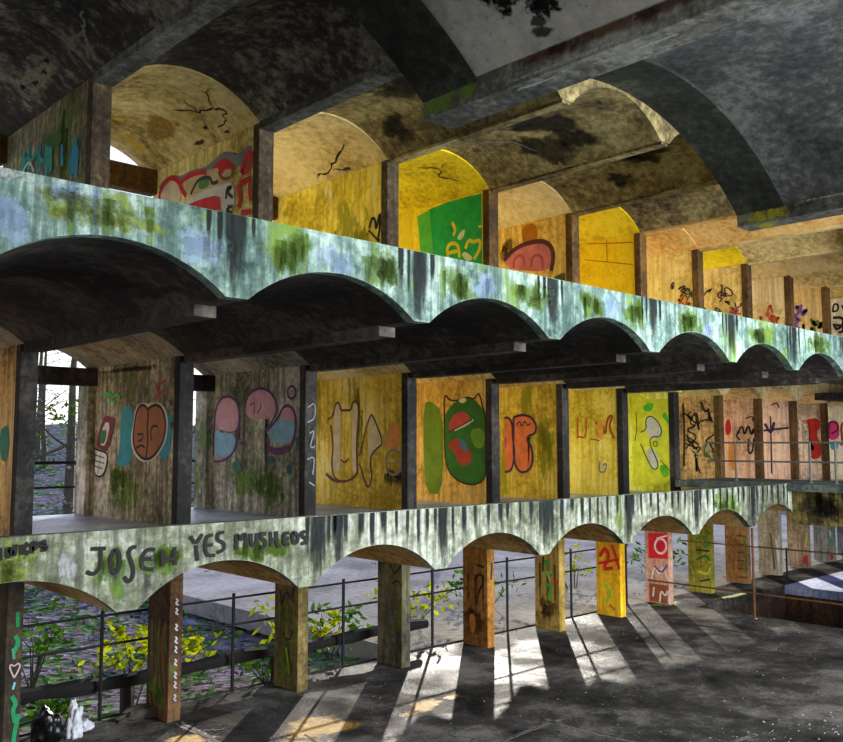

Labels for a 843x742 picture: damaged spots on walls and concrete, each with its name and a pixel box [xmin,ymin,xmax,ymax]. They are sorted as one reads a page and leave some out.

damp [480,0,562,21]
crack [175,89,228,127]
crack [317,144,348,178]
damp [102,198,116,235]
damp [145,206,154,245]
damp [207,209,256,283]
damp [274,239,305,276]
damp [487,503,509,524]
damp [519,484,788,543]
damp [305,505,477,569]